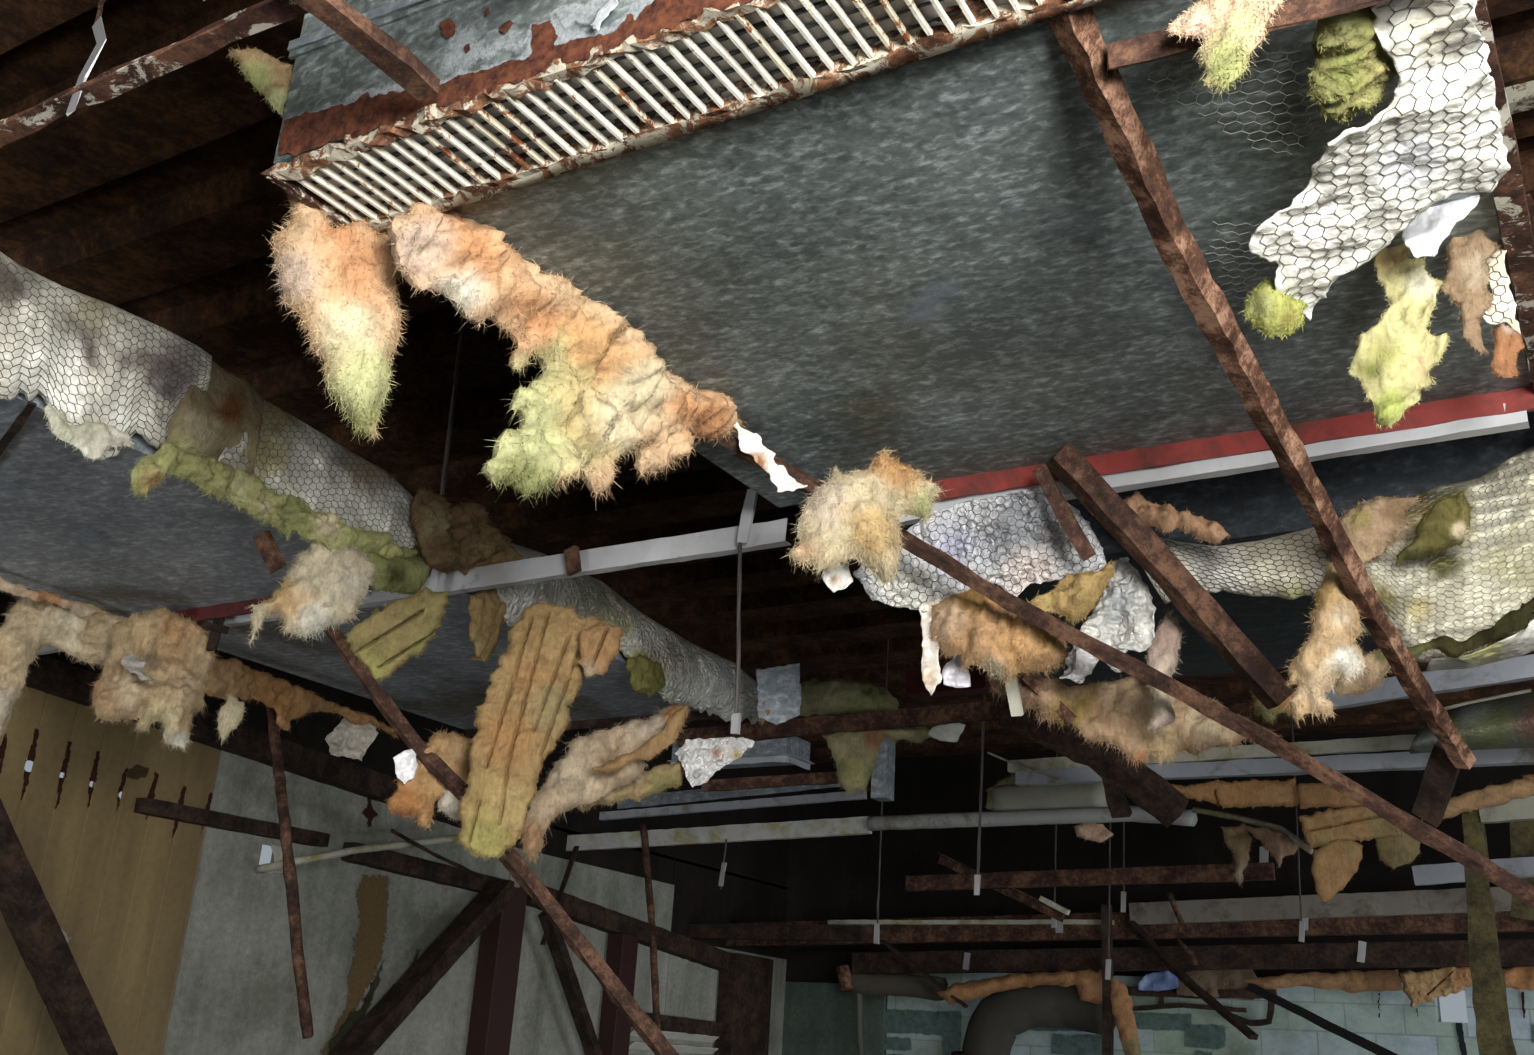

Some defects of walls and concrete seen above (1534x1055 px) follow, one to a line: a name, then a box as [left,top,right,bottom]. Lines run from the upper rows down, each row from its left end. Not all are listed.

rust [278,0,753,156]
peeling [550,0,618,31]
rust [416,0,1108,213]
rust [364,203,411,232]